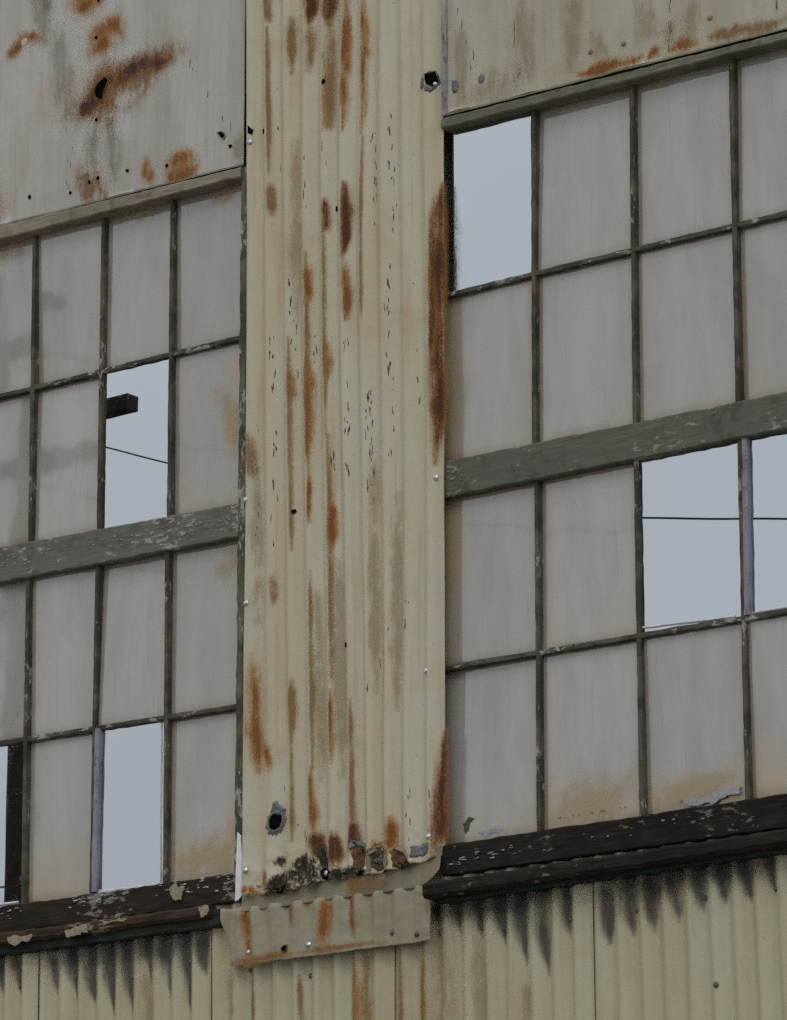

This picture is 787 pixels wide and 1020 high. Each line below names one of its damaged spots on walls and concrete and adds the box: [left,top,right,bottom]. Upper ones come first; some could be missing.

rust [78,14,173,126]
rust [286,0,369,662]
rust [428,182,449,464]
rust [240,582,449,1020]
peeling [683,786,740,806]
leakage [0,958,21,991]
peeling [7,934,32,946]
peeling [65,924,88,938]
leakage [51,932,209,1009]
peeling [155,876,232,901]
leakage [434,887,571,965]
leakage [600,858,775,939]